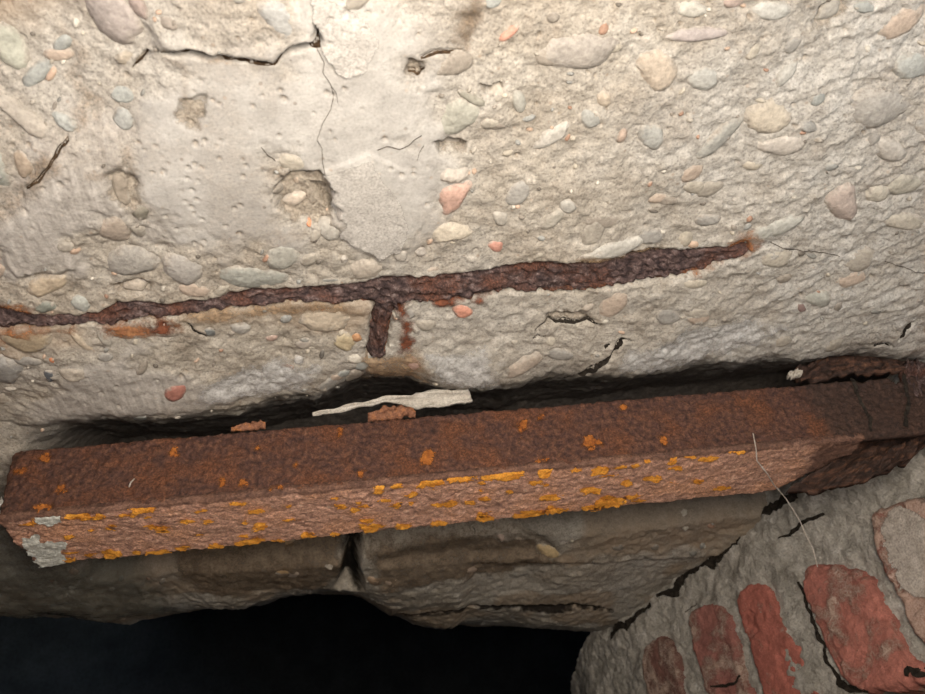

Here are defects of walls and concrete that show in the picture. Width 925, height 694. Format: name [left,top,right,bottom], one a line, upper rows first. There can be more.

crack [133,28,338,174]
crack [26,136,69,189]
peeling [274,162,409,261]
corrosion [365,303,426,382]
spalling [546,311,590,320]
corrosion [231,420,266,433]
peeling [312,389,473,416]
corrosion [793,355,925,397]
corrosion [786,437,925,496]
crack [760,493,825,538]
crack [401,536,741,641]
crack [797,582,868,693]